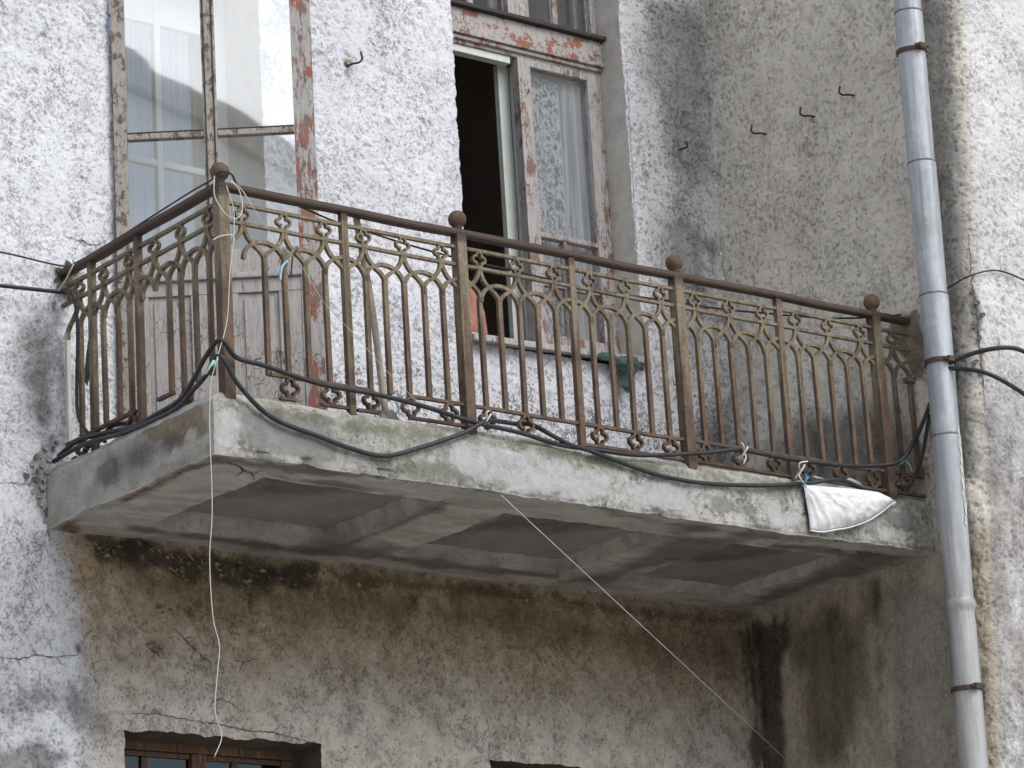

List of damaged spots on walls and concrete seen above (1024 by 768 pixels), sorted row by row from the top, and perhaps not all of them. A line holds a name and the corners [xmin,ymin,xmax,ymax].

flaking render [23,435,60,523]
water stain [456,442,687,510]
crack [2,651,79,665]
water stain [743,619,790,768]